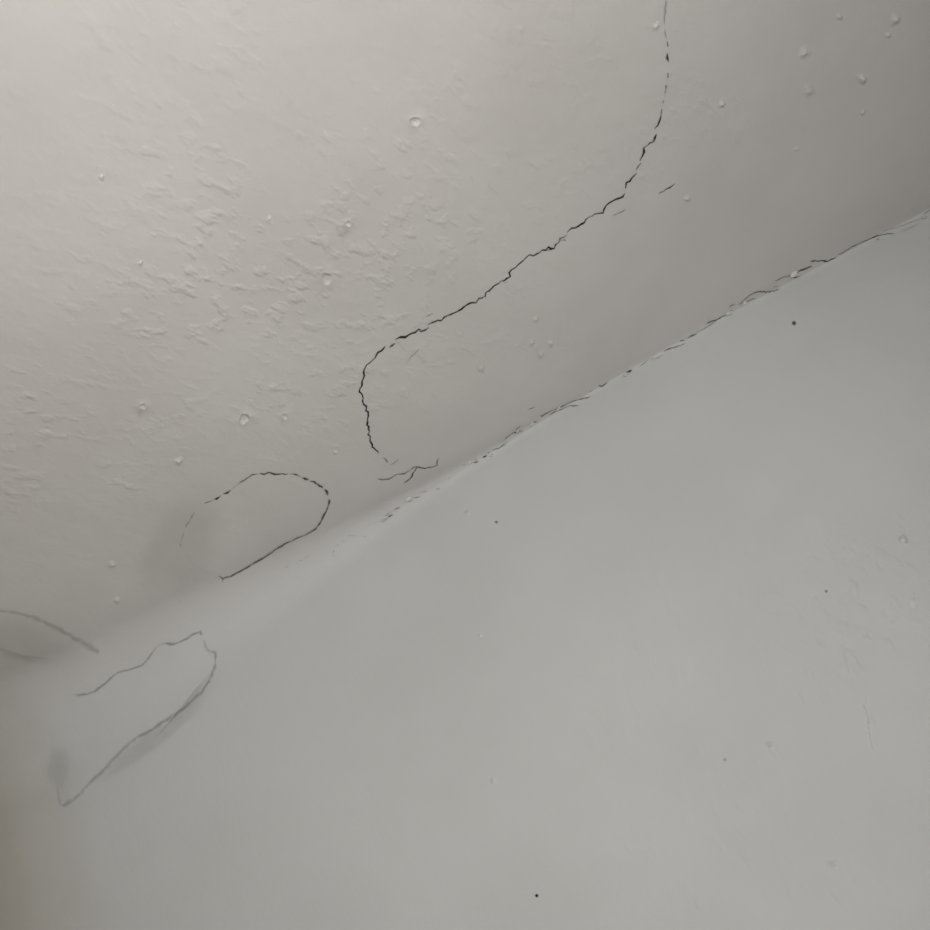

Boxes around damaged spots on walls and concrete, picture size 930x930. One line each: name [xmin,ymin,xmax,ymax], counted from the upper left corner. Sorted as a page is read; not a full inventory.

crack [359,85,667,453]